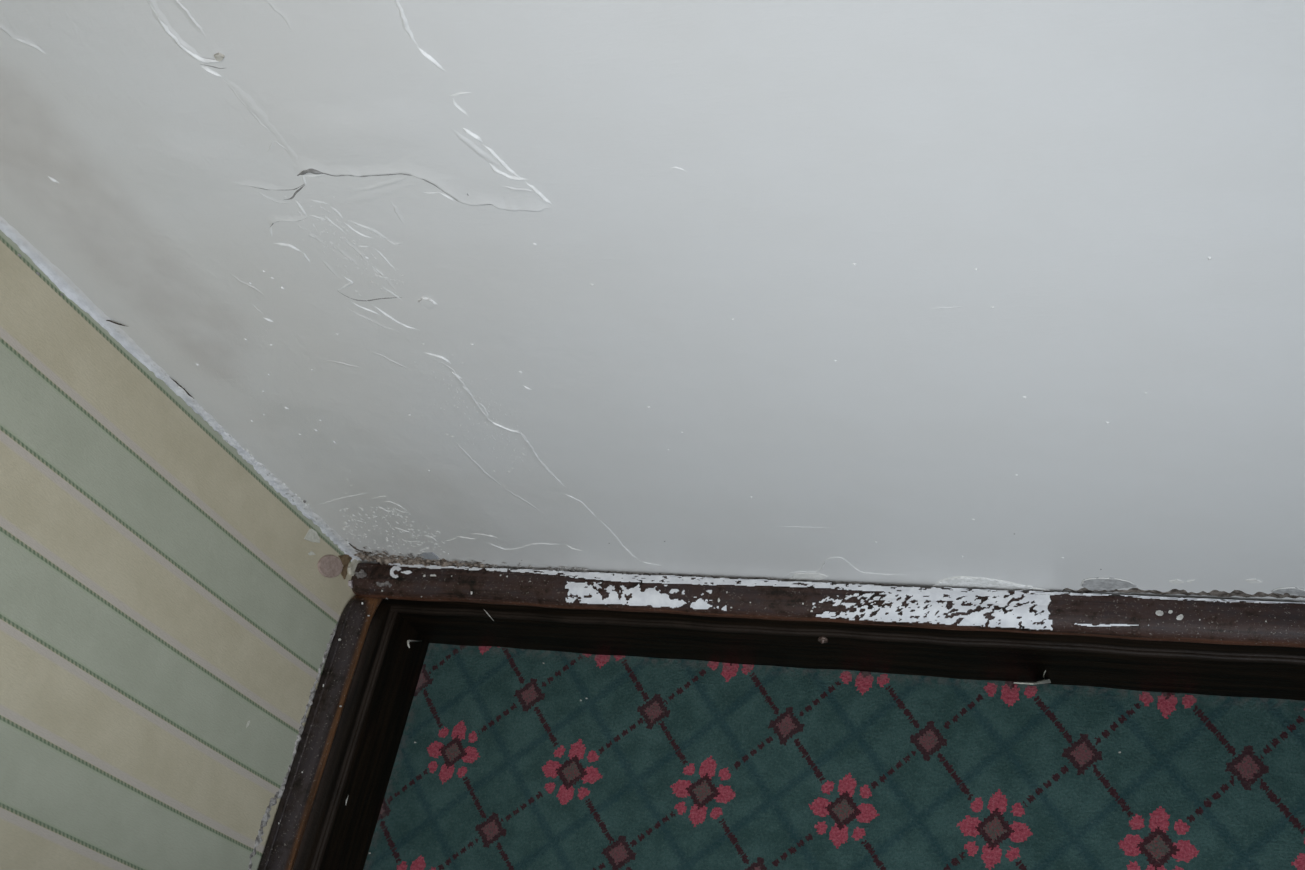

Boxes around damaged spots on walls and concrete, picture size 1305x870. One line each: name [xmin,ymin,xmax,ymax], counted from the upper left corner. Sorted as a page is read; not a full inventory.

peeling [233,128,553,335]